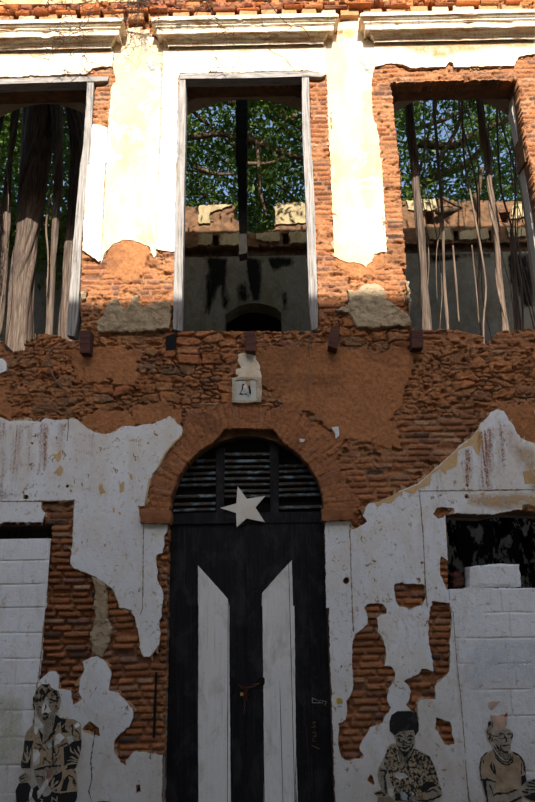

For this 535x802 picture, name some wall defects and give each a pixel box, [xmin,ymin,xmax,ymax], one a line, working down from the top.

spalling [125,3,158,41]
spalling [520,0,535,9]
spalling [0,56,535,529]
spalling [38,501,171,764]
spalling [338,603,395,760]
spalling [394,582,452,718]
spalling [435,718,454,745]
spalling [440,558,465,588]